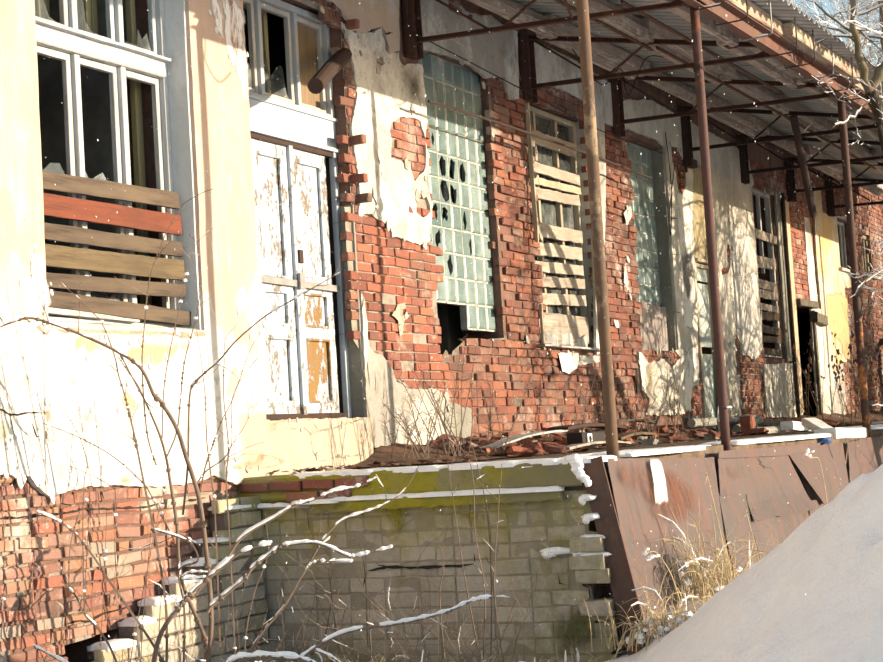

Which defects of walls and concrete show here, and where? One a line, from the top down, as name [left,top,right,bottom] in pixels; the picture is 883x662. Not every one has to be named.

peeling [208,0,249,96]
flaking render [296,0,349,56]
flaking render [334,61,604,438]
flaking render [604,123,708,431]
peeling [721,213,766,419]
flaking render [748,159,883,414]
flaking render [0,470,239,662]